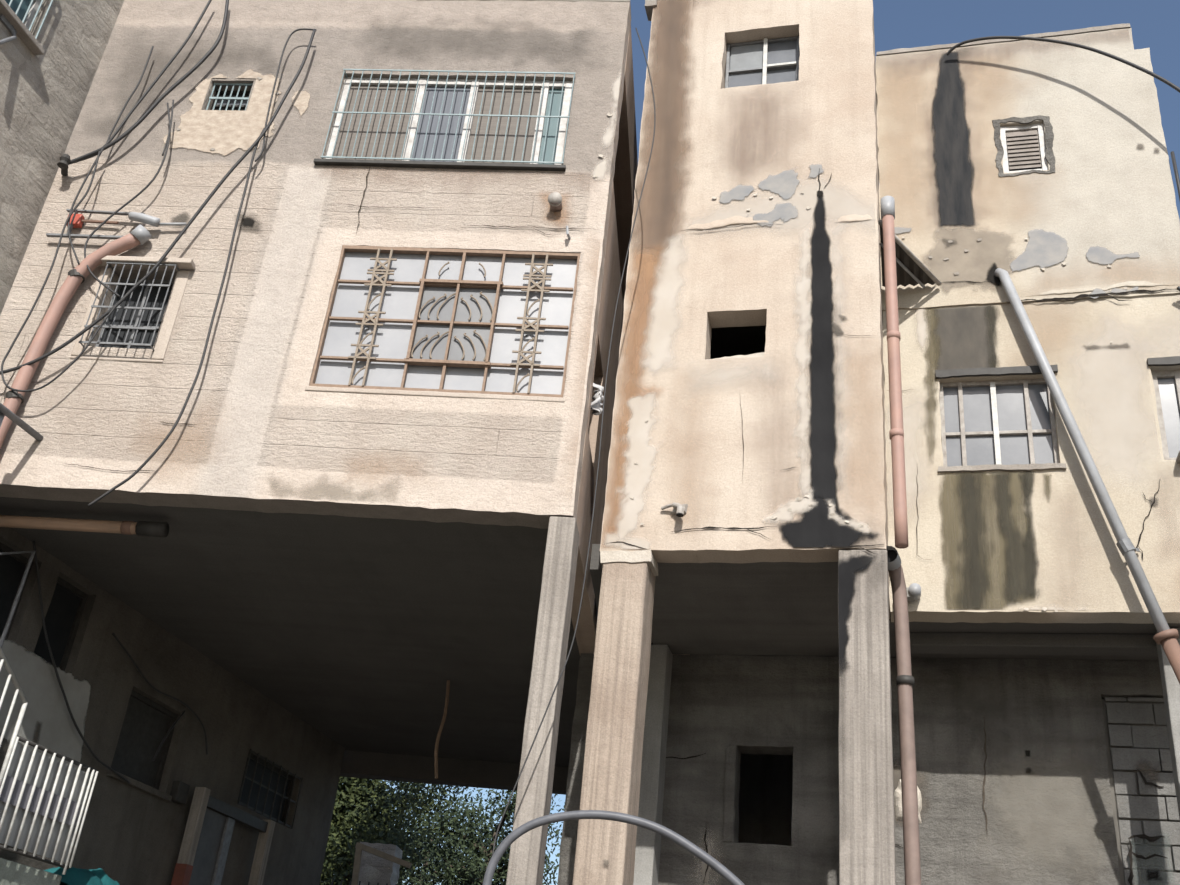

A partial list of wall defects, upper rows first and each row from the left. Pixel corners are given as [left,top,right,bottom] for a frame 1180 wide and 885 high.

peeling [163,69,310,156]
damp [932,52,975,226]
crack [337,167,442,233]
damp [632,0,690,370]
peeling [712,164,824,226]
peeling [1086,246,1140,268]
damp [780,168,877,671]
damp [917,305,997,450]
crack [672,526,769,539]
damp [996,471,1036,601]
crack [1125,481,1160,566]
crack [1128,834,1166,885]